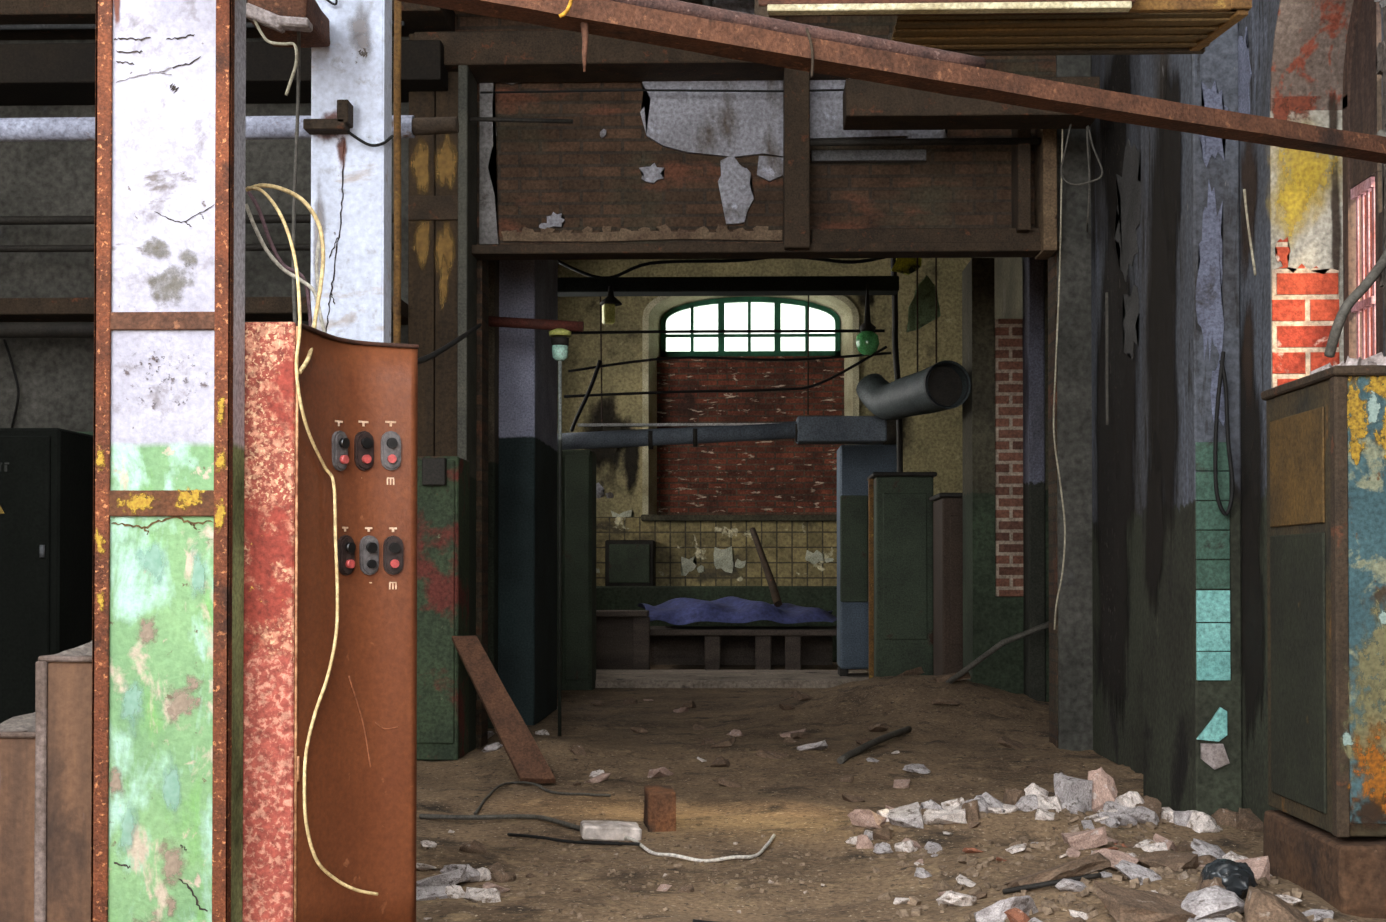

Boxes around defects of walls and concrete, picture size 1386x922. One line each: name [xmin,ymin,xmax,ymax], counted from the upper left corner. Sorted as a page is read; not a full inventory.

crack [114,34,201,83]
leakage [1104,55,1131,94]
corrosion [1272,96,1320,121]
corrosion [321,112,347,165]
corrosion [411,137,457,192]
flaking render [479,80,783,245]
leakage [1241,142,1257,273]
leakage [144,239,196,300]
flaking render [1272,237,1339,388]
leakage [1097,119,1181,719]
peeling [681,546,746,576]
peeling [109,767,123,793]